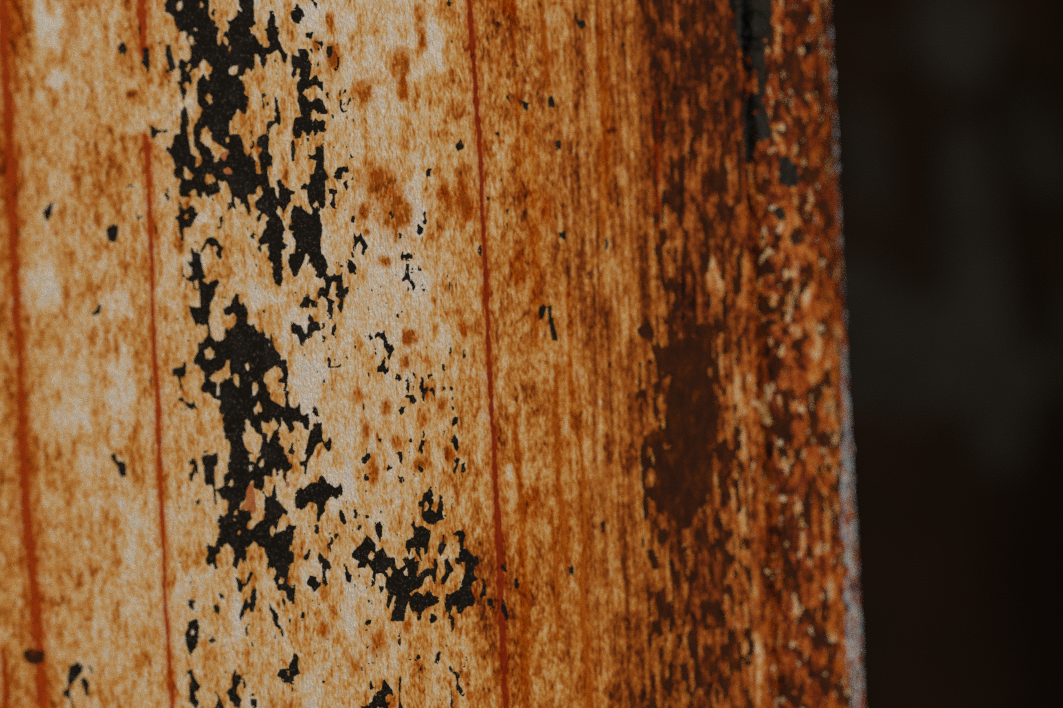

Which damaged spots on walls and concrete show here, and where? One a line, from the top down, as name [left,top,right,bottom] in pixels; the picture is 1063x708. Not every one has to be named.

rust [136,0,147,58]
peeling [718,0,786,173]
rust [0,0,49,708]
peeling [63,662,94,708]
rust [143,134,175,708]
peeling [215,670,257,708]
peeling [274,638,329,692]
peeling [139,0,509,656]
peeling [361,646,403,708]
rust [444,0,509,708]
rust [551,378,591,708]
rust [635,0,859,708]